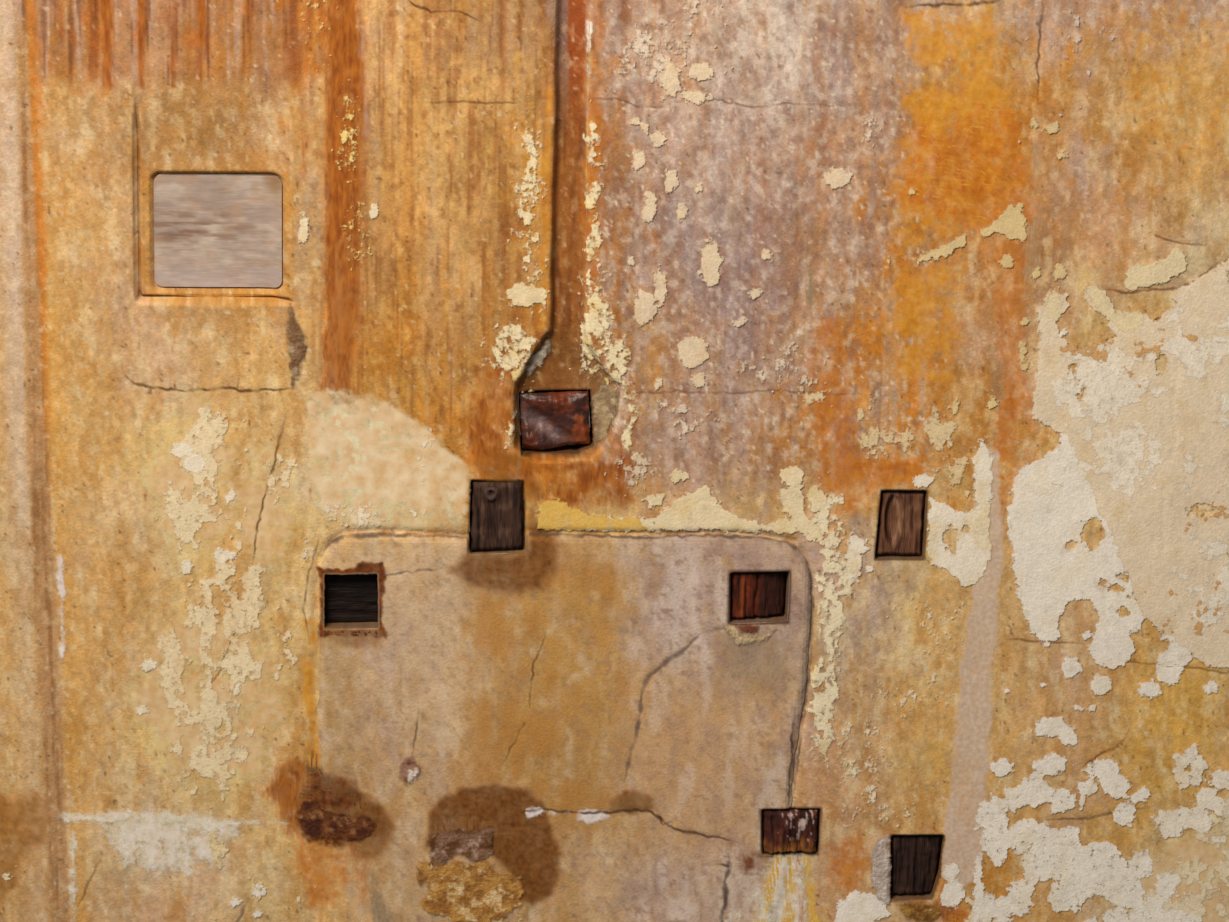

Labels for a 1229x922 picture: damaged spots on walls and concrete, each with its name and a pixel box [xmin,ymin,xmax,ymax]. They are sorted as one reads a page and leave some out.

crack [920,0,993,8]
corrosion [320,0,365,405]
peeling [480,121,551,393]
corrosion [891,6,1034,246]
corrosion [815,319,925,511]
peeling [140,405,298,808]
crack [635,637,696,733]
peeling [535,181,1229,922]
damp [0,793,46,900]
damp [61,809,259,910]
damp [426,783,561,906]
crack [526,808,729,922]